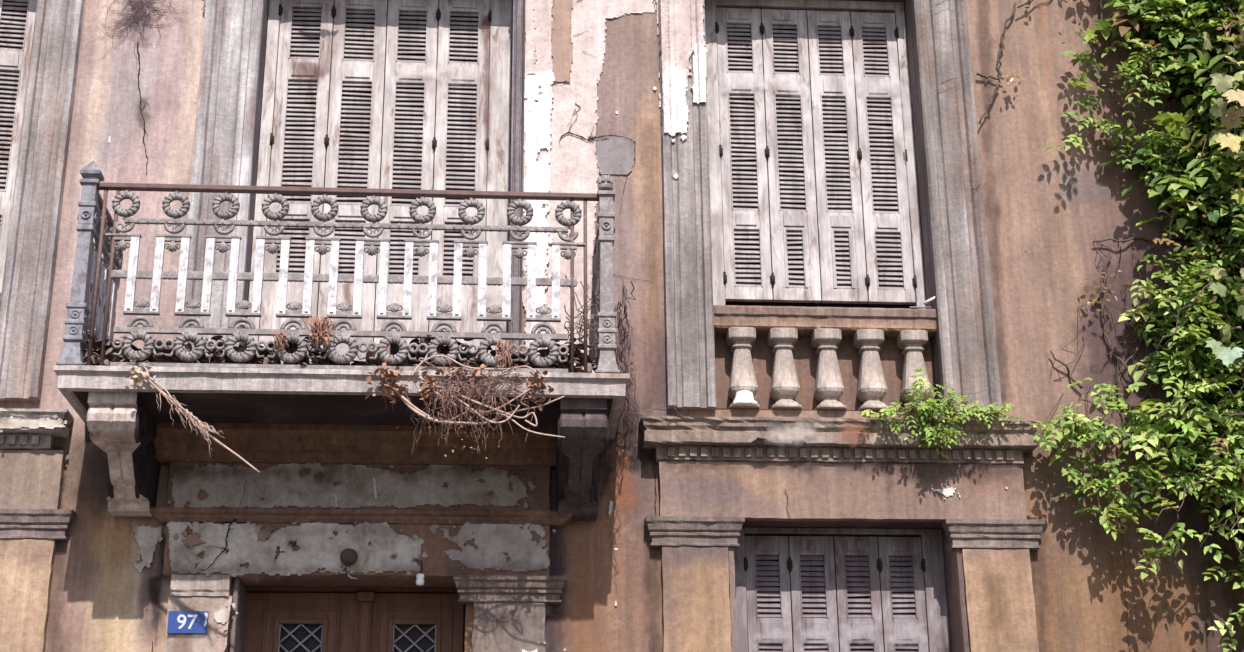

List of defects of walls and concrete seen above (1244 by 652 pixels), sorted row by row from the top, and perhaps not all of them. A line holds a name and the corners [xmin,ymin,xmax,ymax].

crack [137,42,148,175]
flaking render [522,0,708,370]
peeling [133,463,556,577]
peeling [931,486,960,500]
flaking render [214,603,238,635]